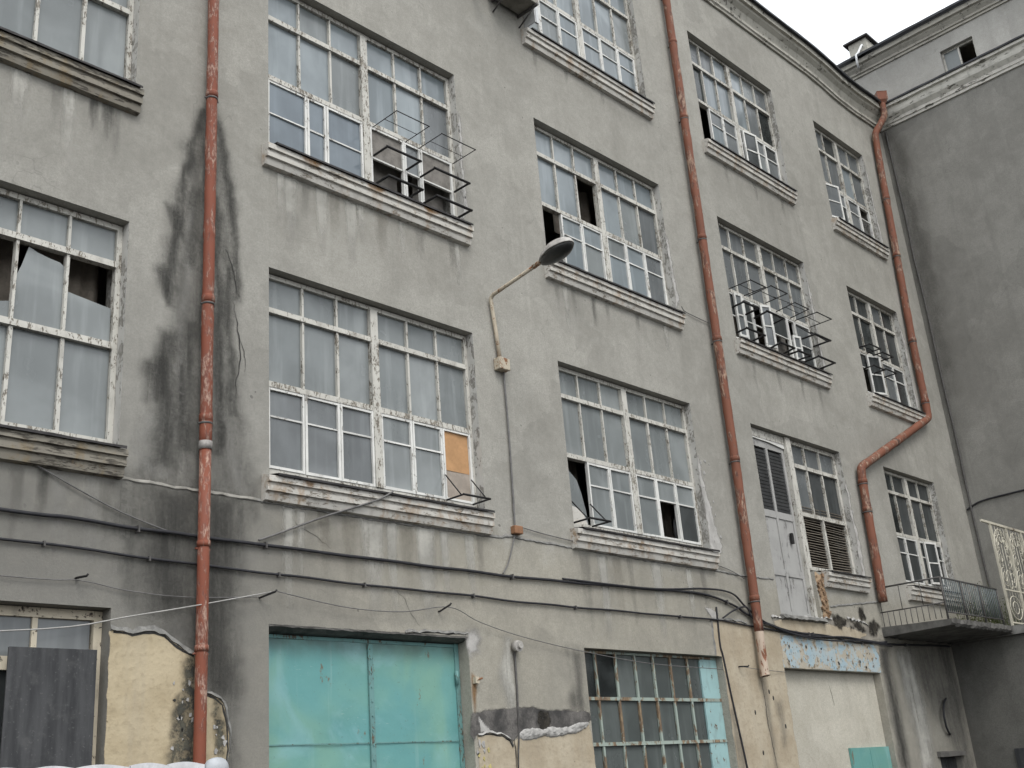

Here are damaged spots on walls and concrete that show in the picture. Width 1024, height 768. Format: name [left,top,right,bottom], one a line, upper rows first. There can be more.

crack [226,250,246,391]
water stain [120,115,253,694]
spalling [104,624,195,767]
spalling [206,691,232,762]
spalling [470,706,596,768]
spalling [706,572,884,768]